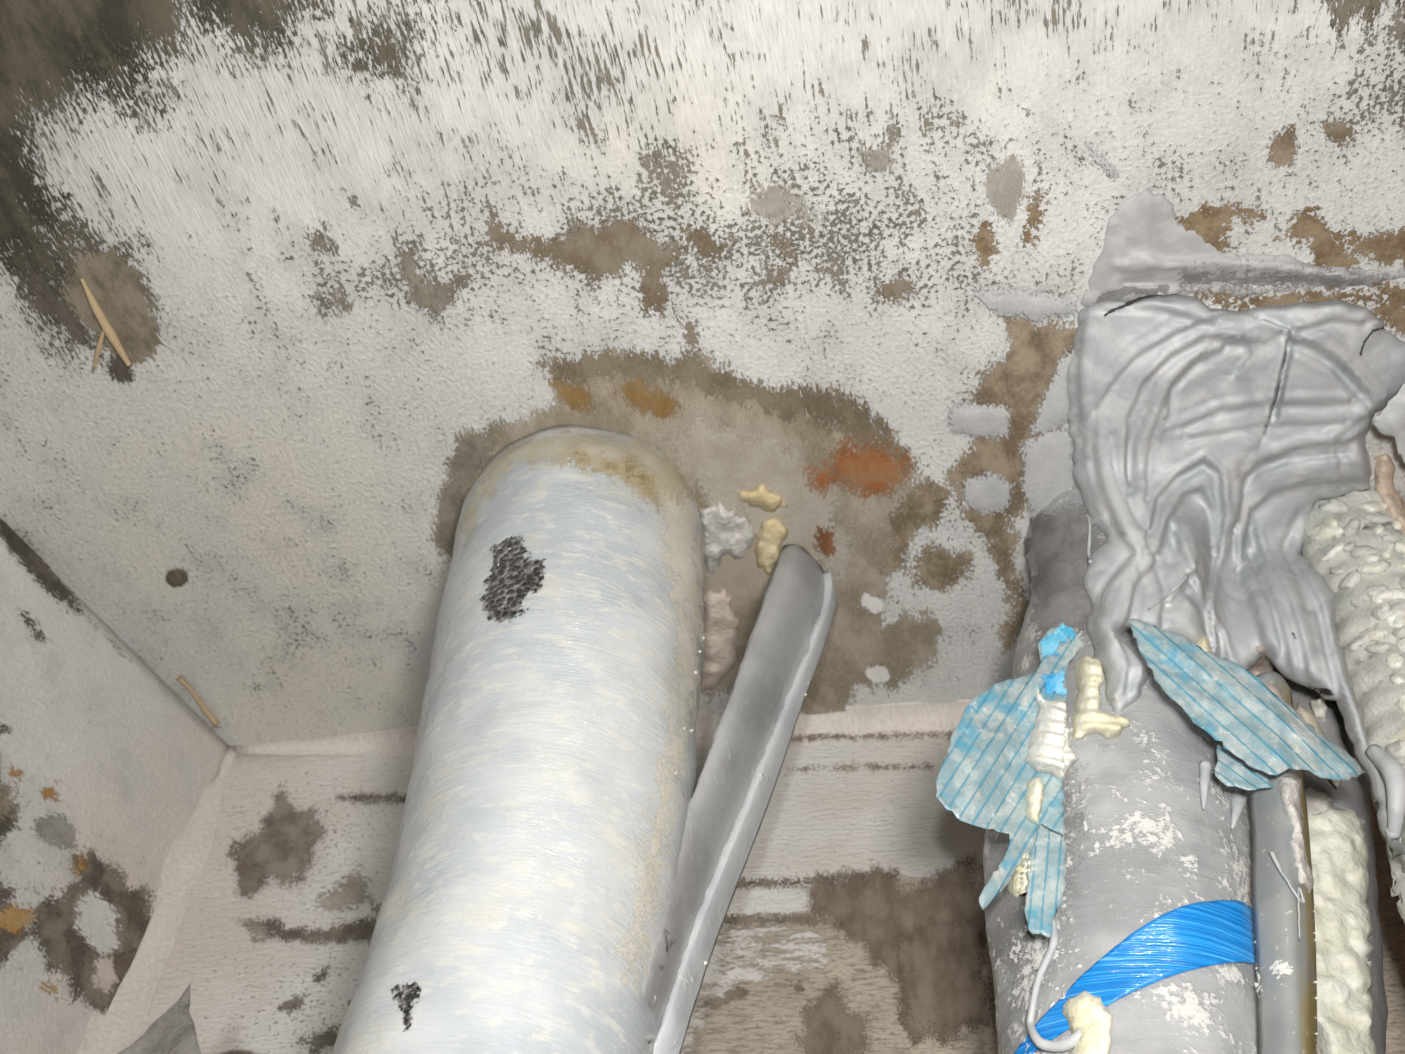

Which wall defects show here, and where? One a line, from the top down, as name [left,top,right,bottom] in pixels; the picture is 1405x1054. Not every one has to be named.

leakage [1314,0,1405,55]
leakage [0,0,457,389]
leakage [392,206,735,357]
leakage [763,225,800,294]
leakage [870,267,919,307]
leakage [968,183,1049,272]
leakage [1174,198,1405,336]
rust [803,434,915,504]
leakage [225,784,377,925]
leakage [0,872,26,970]